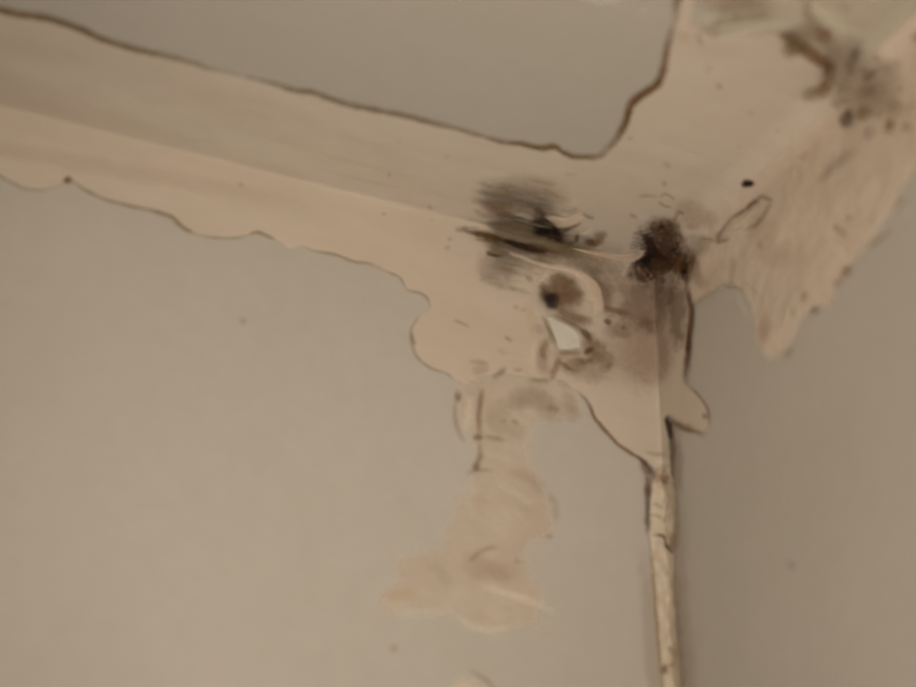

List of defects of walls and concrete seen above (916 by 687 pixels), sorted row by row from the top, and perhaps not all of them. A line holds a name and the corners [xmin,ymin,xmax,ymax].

peeling [0,0,839,469]
damp [471,231,545,253]
damp [535,211,578,241]
damp [635,221,688,280]
crack [647,466,682,687]